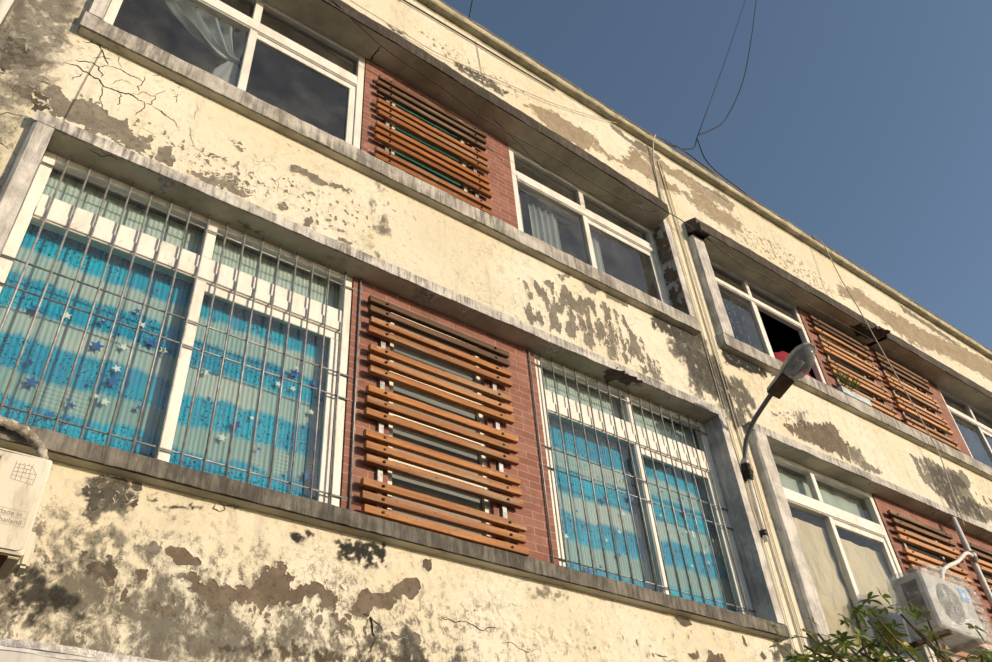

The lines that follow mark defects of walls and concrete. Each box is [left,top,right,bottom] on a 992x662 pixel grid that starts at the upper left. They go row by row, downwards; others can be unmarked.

damp [0,0,76,104]
crack [40,40,206,156]
peeling [0,35,371,246]
peeling [414,26,992,386]
peeling [79,473,144,513]
peeling [770,410,883,476]
peeling [79,539,433,652]